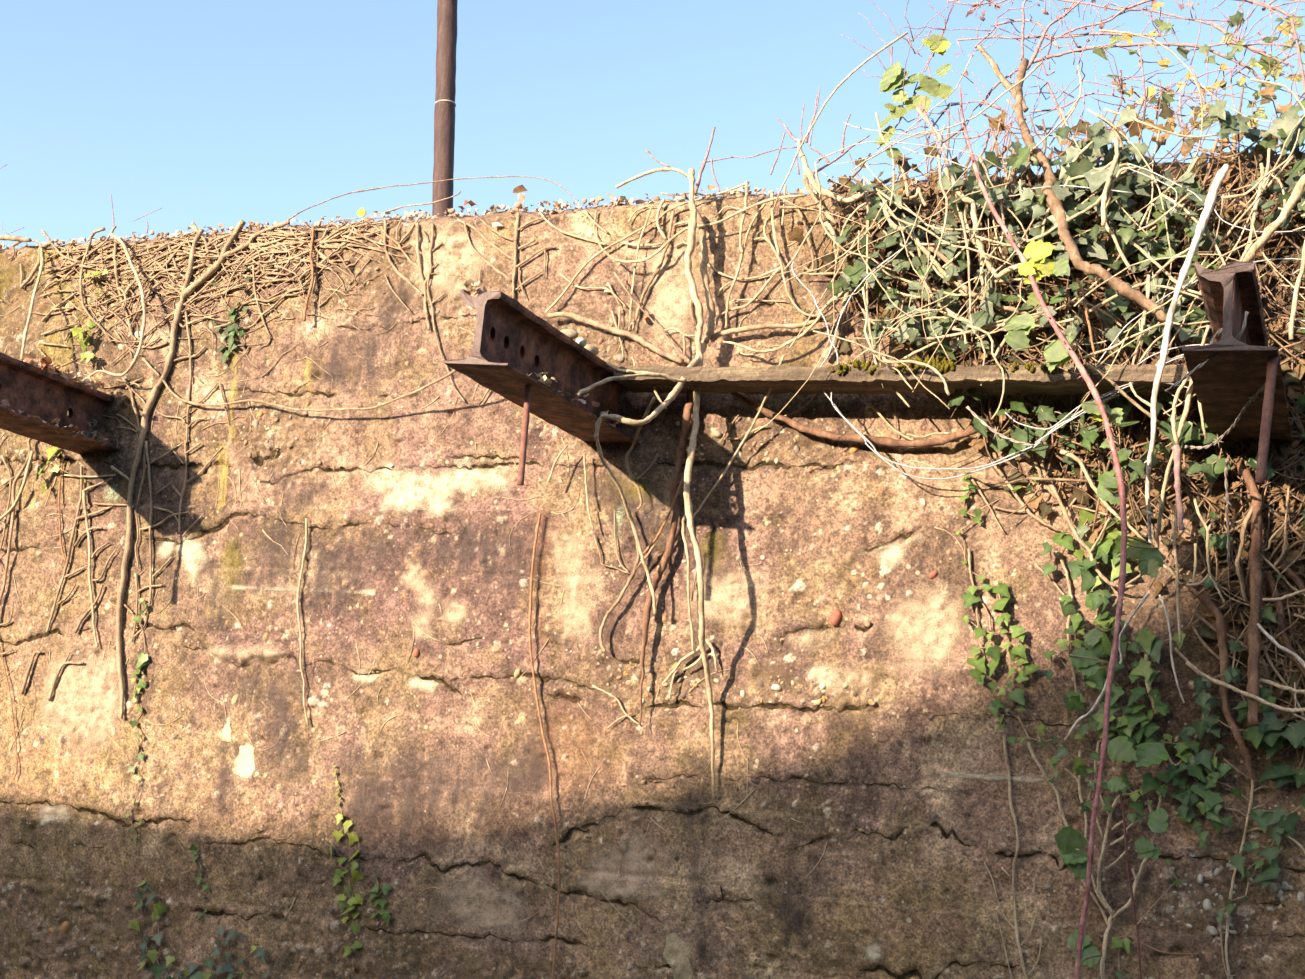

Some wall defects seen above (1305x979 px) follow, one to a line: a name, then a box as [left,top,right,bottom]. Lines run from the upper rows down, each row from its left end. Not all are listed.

crack [0,774,1068,923]
crack [1159,848,1230,863]
crack [190,908,266,928]
crack [360,926,591,948]
crack [635,956,671,969]